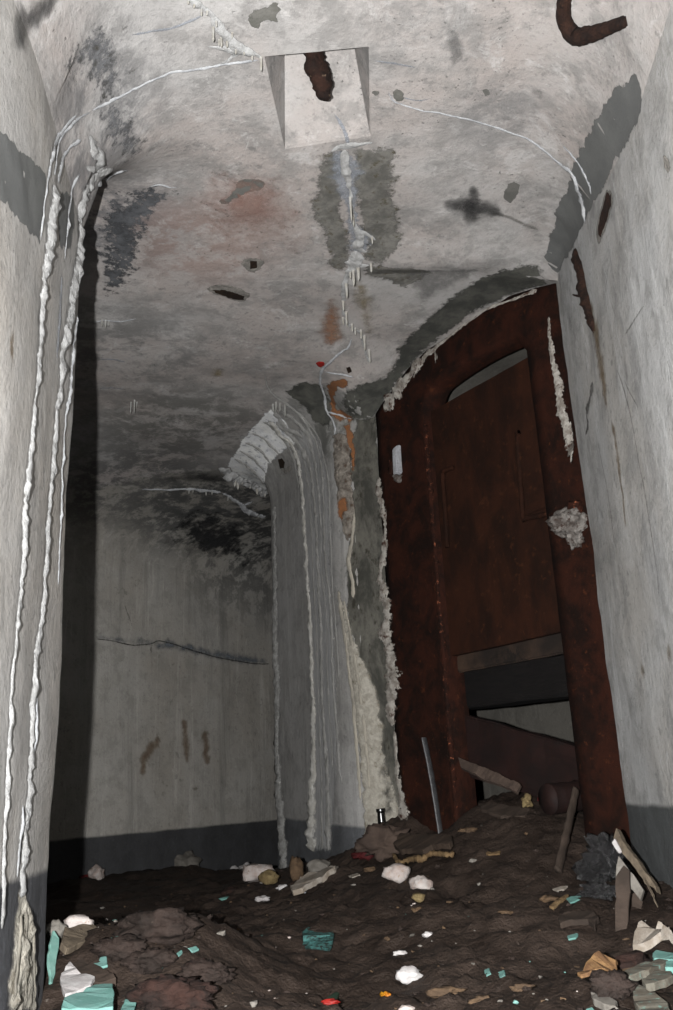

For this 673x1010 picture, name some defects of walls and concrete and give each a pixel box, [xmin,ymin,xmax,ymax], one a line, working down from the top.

leakage [1,113,128,1010]
crack [99,639,260,664]
spalling [207,285,250,302]
leakage [142,376,399,869]
leakage [311,116,467,362]
peeling [286,74,642,598]